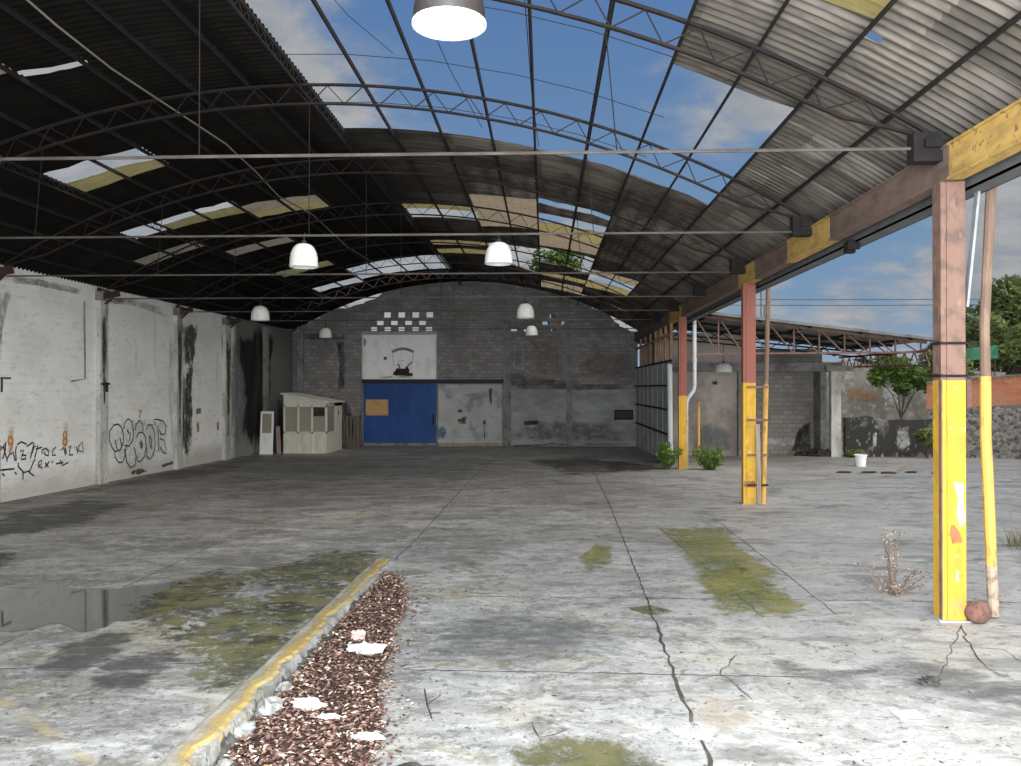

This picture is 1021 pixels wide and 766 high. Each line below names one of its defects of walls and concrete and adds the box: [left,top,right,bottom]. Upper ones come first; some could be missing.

water stain [178,322,198,455]
water stain [222,329,283,443]
crack [698,655,754,701]